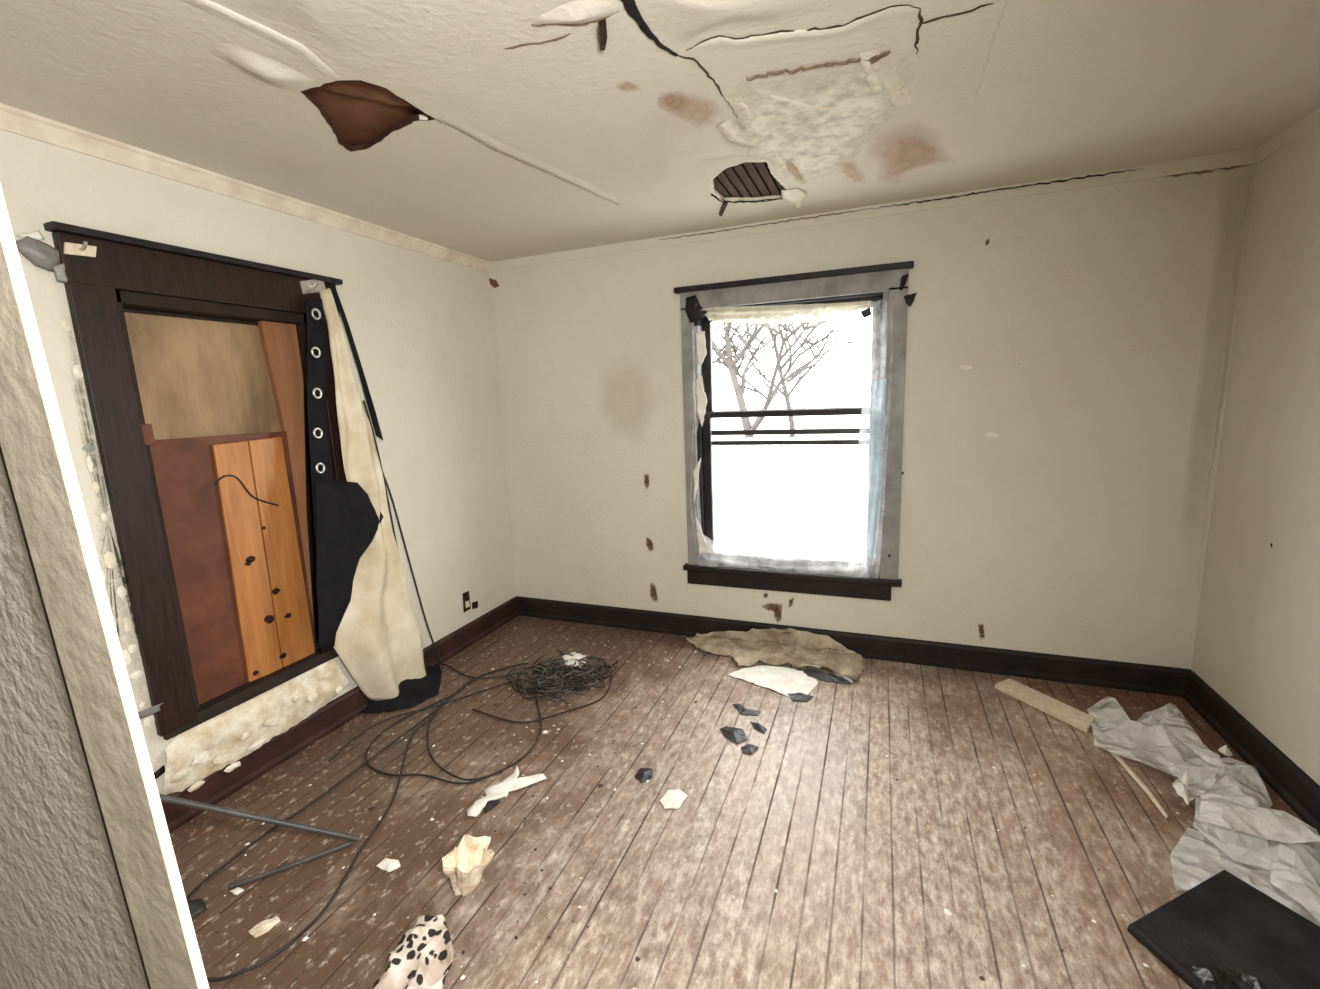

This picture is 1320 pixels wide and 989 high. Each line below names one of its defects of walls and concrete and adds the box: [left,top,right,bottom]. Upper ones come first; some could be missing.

spalling [300,80,435,152]
peeling [504,0,624,51]
flaking render [709,48,912,202]
crack [621,0,1009,136]
peeling [73,365,143,680]
peeling [139,701,155,727]
flaking render [159,659,349,795]